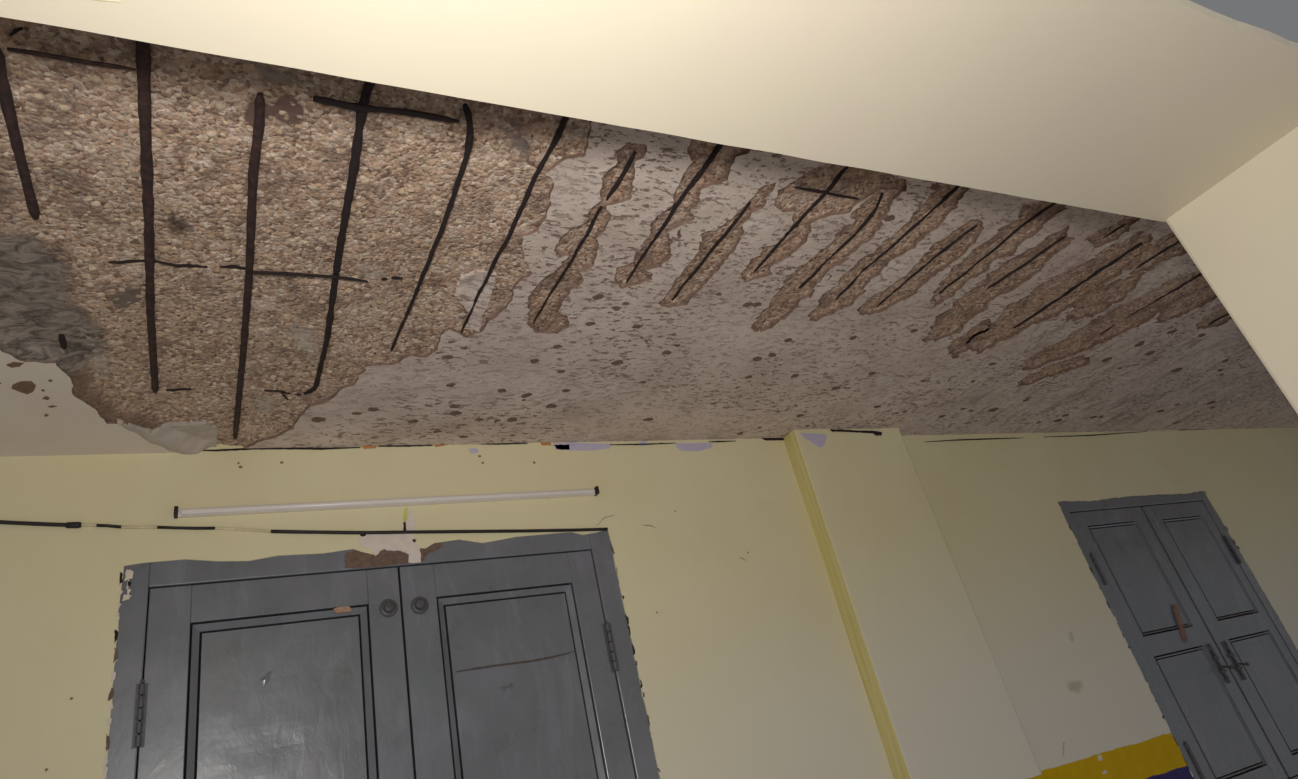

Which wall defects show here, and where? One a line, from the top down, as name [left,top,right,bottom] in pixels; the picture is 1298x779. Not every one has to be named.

spalling [0,17,1298,455]
peeling [345,542,443,569]